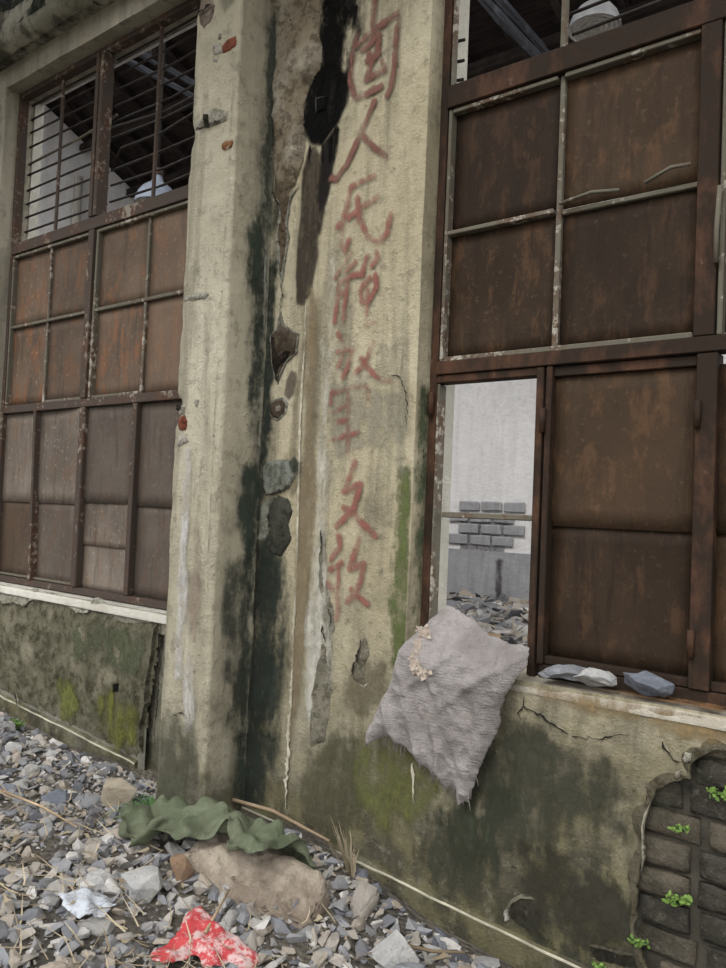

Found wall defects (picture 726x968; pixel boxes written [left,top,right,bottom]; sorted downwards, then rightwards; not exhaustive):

leakage [0,0,46,23]
leakage [308,127,339,233]
flaking render [270,312,300,384]
leakage [222,15,333,809]
flaking render [269,397,288,421]
flaking render [258,495,293,565]
flaking render [310,529,335,747]
crack [517,696,624,740]
rust [572,689,726,743]
leakage [300,734,360,843]
leakage [422,724,642,968]
flaking render [587,739,726,968]